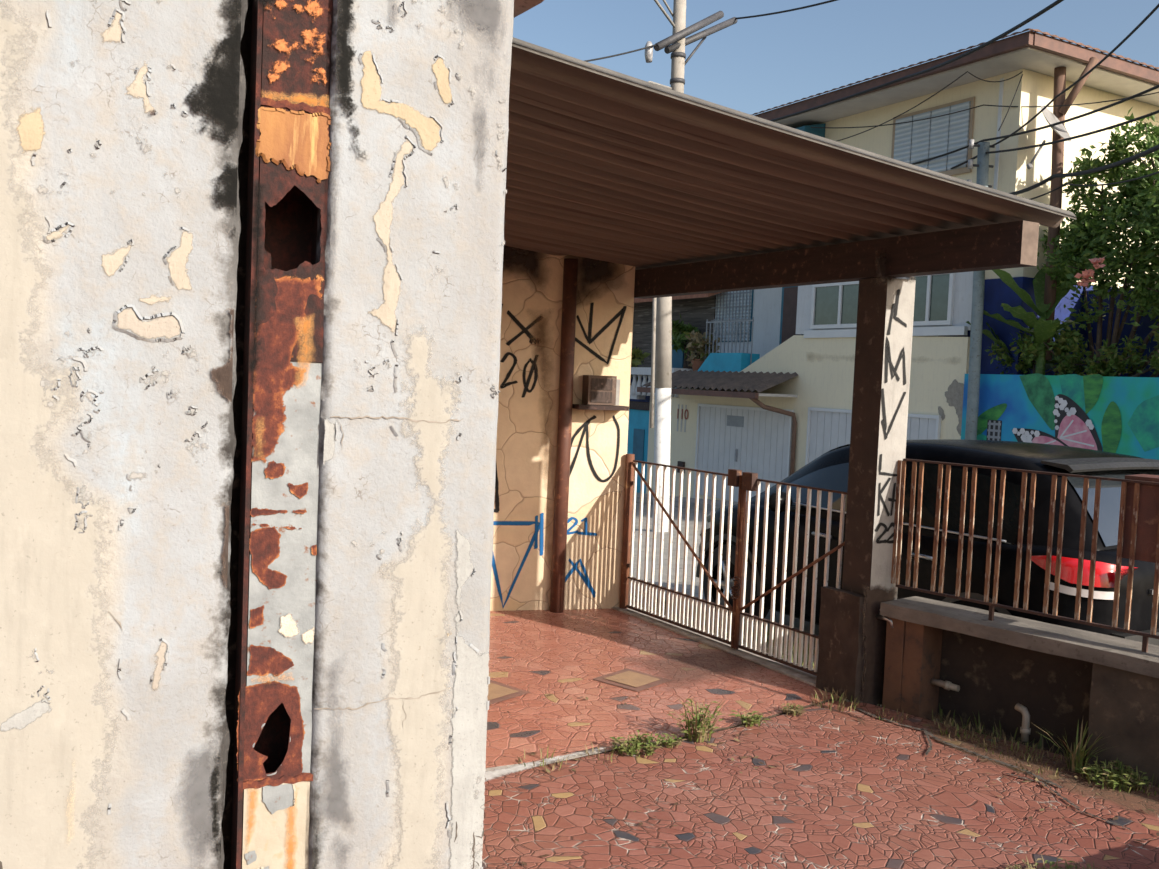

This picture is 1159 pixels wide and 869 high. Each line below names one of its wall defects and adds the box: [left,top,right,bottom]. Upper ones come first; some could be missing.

peeling [126,63,189,153]
leakage [185,0,242,148]
corrosion [265,0,329,107]
leakage [335,0,366,159]
leakage [212,163,238,237]
peeling [112,227,198,361]
peeling [0,0,136,869]
corrosion [249,275,324,589]
peeling [355,51,490,869]
corrosion [249,605,264,629]
corrosion [236,644,305,839]
corrosion [287,806,296,869]